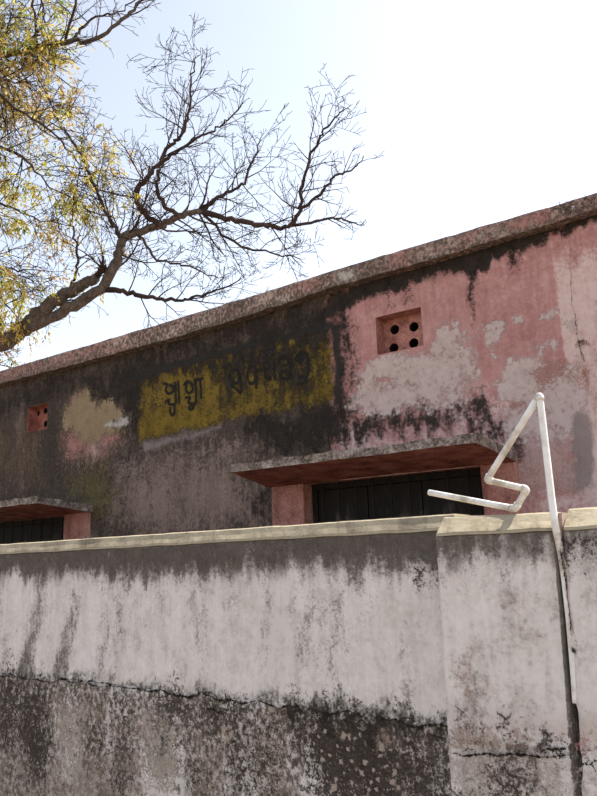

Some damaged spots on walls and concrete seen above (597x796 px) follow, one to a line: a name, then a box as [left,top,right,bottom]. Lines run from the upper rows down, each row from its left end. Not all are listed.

damp [0,191,597,527]
flaking render [345,314,523,417]
flaking render [61,386,131,468]
flaking render [493,338,588,493]
damp [412,534,438,592]
damp [558,532,597,580]
damp [0,539,156,796]
crack [0,661,448,731]
damp [147,671,536,796]
flaking render [307,721,401,796]
crack [451,747,597,772]
damp [537,724,574,769]